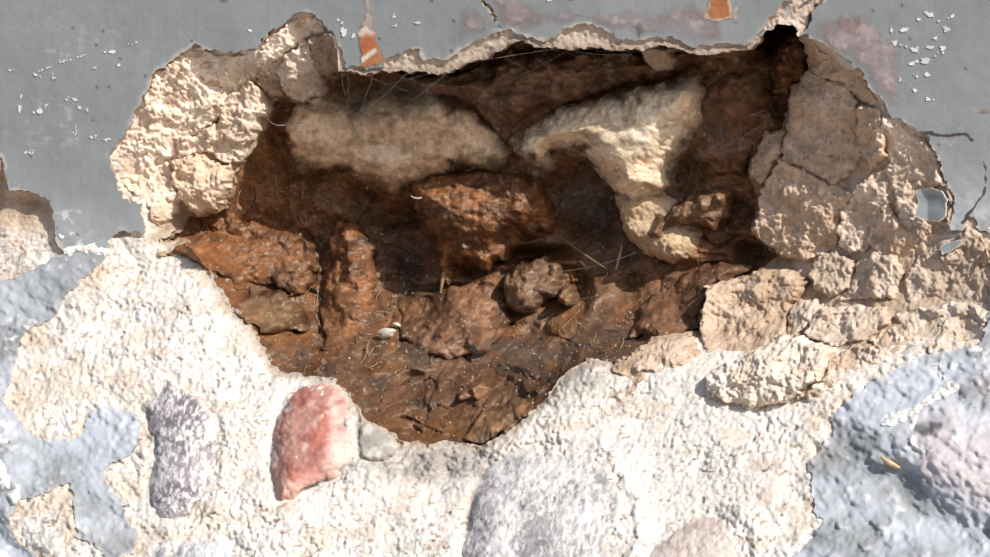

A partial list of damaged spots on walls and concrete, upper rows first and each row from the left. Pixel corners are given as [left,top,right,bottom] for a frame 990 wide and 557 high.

corrosion [358,26,383,68]
crack [482,0,503,36]
corrosion [703,0,732,21]
crack [747,0,828,48]
flaking render [0,158,64,280]
spalling [110,11,990,446]
flaking render [0,228,988,557]